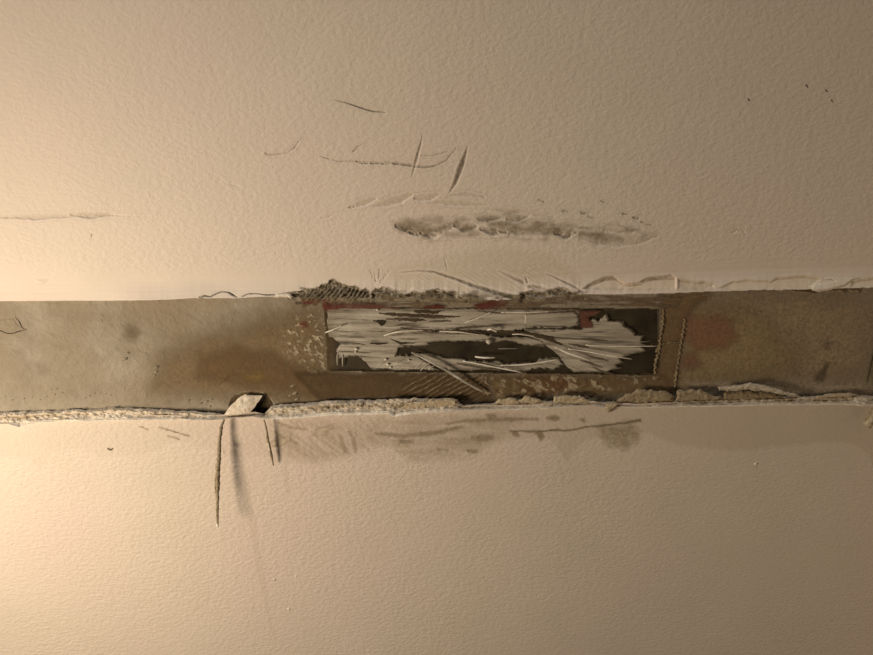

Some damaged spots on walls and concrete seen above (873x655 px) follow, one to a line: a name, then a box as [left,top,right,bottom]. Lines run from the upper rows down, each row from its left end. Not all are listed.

crack [0,209,158,223]
peeling [197,289,308,299]
spalling [578,270,873,294]
water stain [155,292,873,402]
spalling [0,383,873,427]